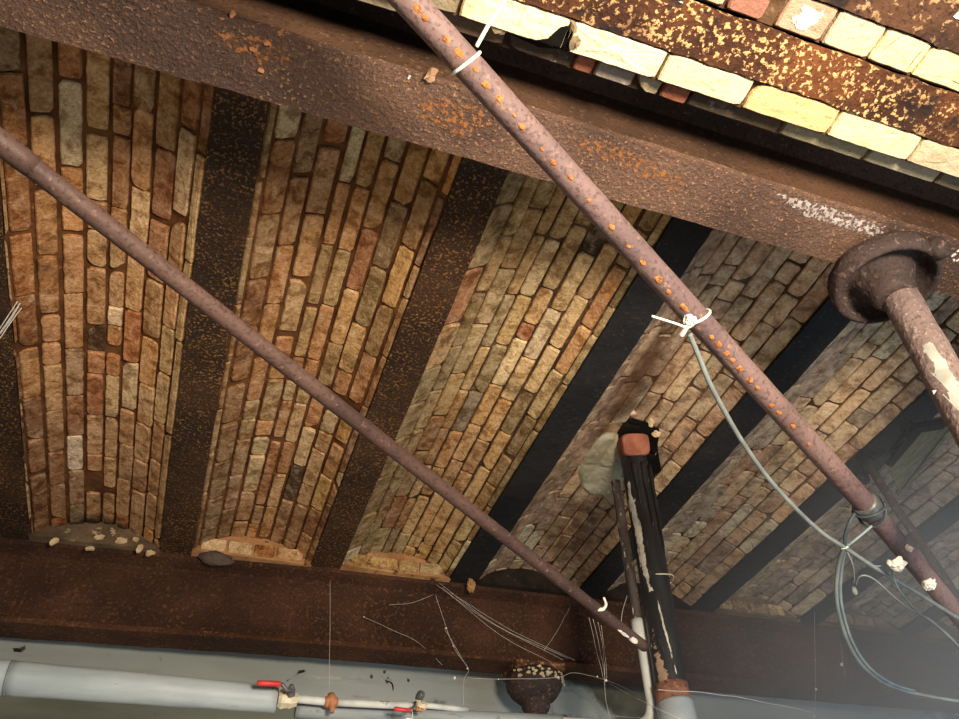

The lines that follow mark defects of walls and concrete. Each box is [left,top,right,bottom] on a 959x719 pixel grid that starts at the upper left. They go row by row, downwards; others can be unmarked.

peeling [790,4,825,30]
corrosion [442,35,464,59]
corrosion [424,67,438,83]
corrosion [472,65,503,104]
corrosion [519,0,959,147]
corrosion [419,93,492,137]
corrosion [573,136,686,189]
damp [777,194,885,235]
spalling [617,410,661,477]